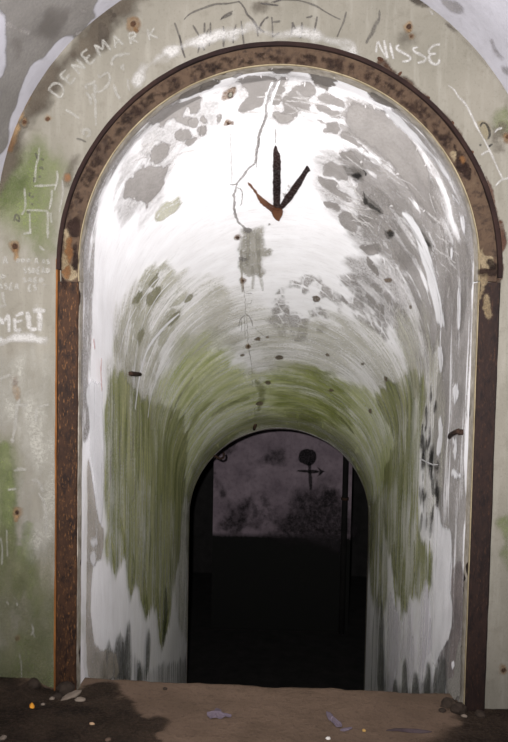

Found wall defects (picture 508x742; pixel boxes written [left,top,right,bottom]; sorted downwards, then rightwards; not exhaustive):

corrosion [377,57,413,85]
crack [230,79,281,228]
peeling [61,79,220,441]
water stain [239,228,271,292]
peeling [165,68,497,702]
water stain [419,389,439,531]
water stain [371,605,445,693]